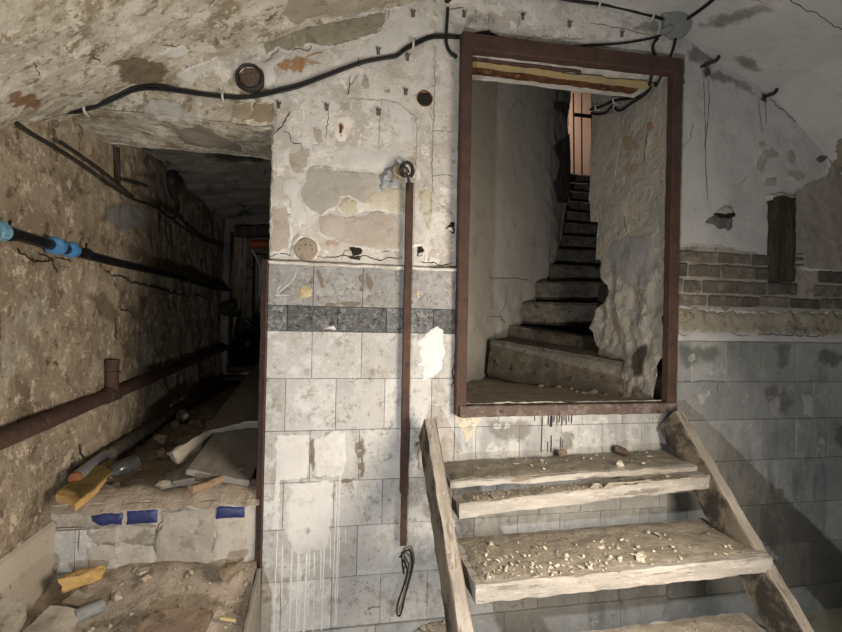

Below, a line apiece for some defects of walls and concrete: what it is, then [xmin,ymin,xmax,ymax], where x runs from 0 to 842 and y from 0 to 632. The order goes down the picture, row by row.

crack [790,0,842,30]
spalling [264,0,434,86]
rust [277,52,322,72]
peeling [269,103,413,256]
flaking render [678,137,842,314]
crack [17,248,71,273]
crack [104,270,211,300]
spalling [598,286,609,302]
peeling [86,507,248,563]